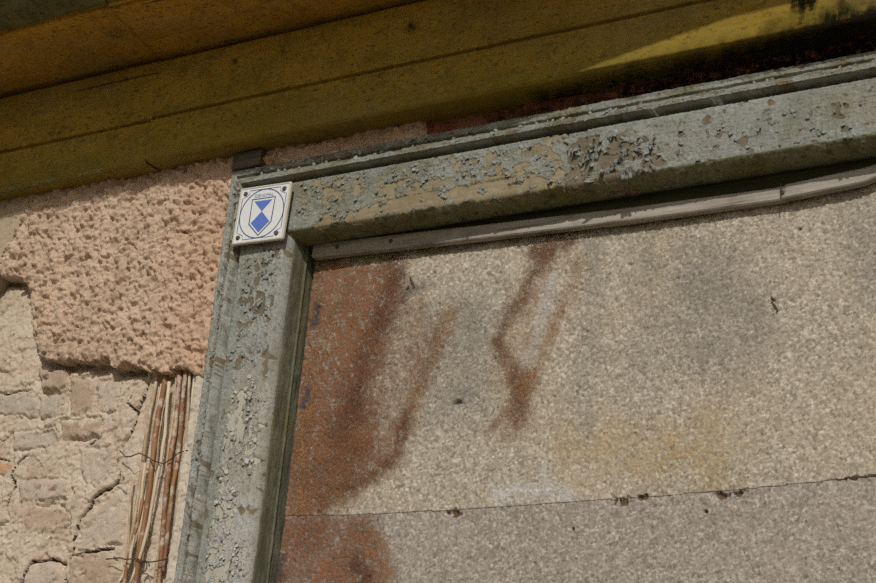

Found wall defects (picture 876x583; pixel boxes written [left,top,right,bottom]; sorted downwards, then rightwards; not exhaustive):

damp [497,0,876,121]
peeling [298,102,666,230]
peeling [676,108,827,157]
peeling [831,100,862,139]
crack [0,440,26,506]
crack [22,474,121,583]
crack [126,378,152,434]
spalling [0,125,524,583]
rust [277,257,426,583]
spalling [613,494,649,506]